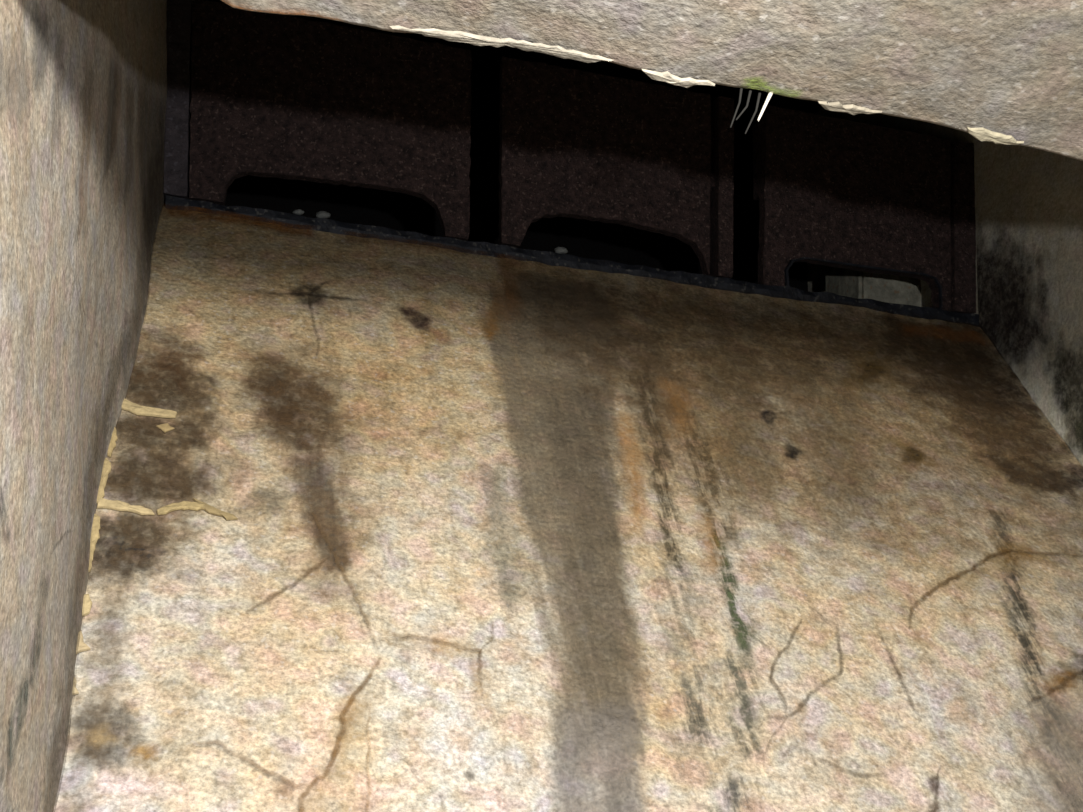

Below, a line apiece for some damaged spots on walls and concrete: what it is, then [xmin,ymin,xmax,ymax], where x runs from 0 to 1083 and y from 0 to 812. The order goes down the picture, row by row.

crack [270,285,350,303]
leakage [887,239,1083,497]
leakage [92,516,163,575]
spalling [122,399,178,433]
leakage [107,364,213,499]
spalling [88,427,238,573]
leakage [248,359,347,565]
leakage [489,276,637,812]
crack [923,550,1058,599]
spalling [76,594,92,655]
crack [329,677,369,767]
crack [216,742,303,812]